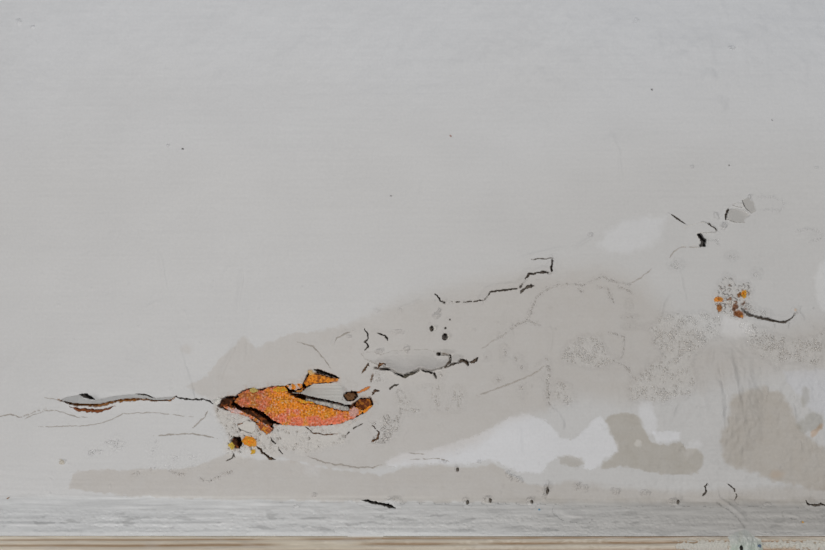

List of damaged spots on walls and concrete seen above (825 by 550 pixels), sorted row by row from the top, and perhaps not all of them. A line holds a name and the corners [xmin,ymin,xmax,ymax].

peeling [713,193,788,230]
crack [0,388,222,443]
flaking render [209,364,404,467]
water stain [69,254,731,508]
crack [293,253,655,385]
water stain [737,349,825,508]